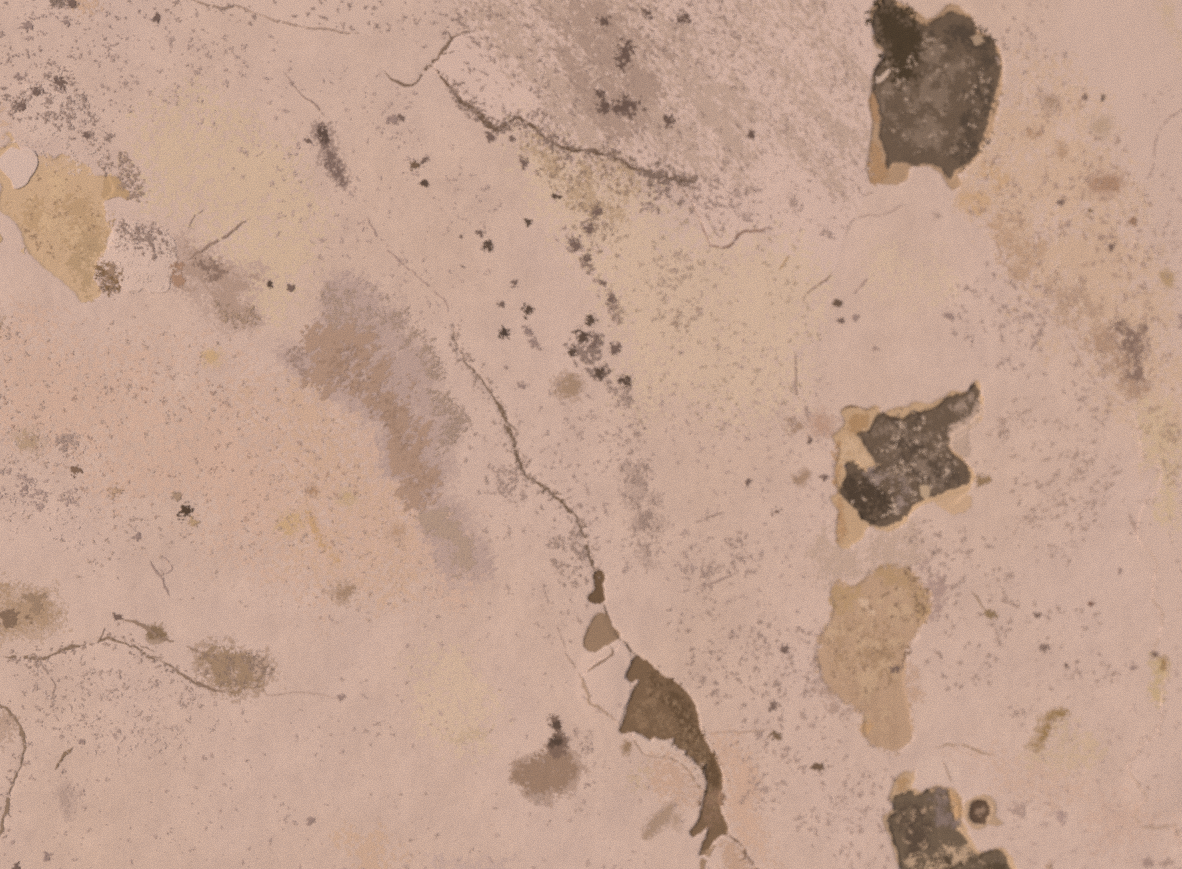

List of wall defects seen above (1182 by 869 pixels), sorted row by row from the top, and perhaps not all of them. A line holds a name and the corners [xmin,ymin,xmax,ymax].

peeling [0,132,178,303]
crack [382,26,770,249]
peeling [435,0,1004,297]
damp [845,0,1182,572]
damp [0,0,880,812]
crack [367,218,604,572]
spalling [830,380,984,549]
crack [4,619,336,706]
peeling [814,563,934,756]
damp [803,517,1024,719]
crack [0,705,26,834]
spalling [883,771,1016,869]